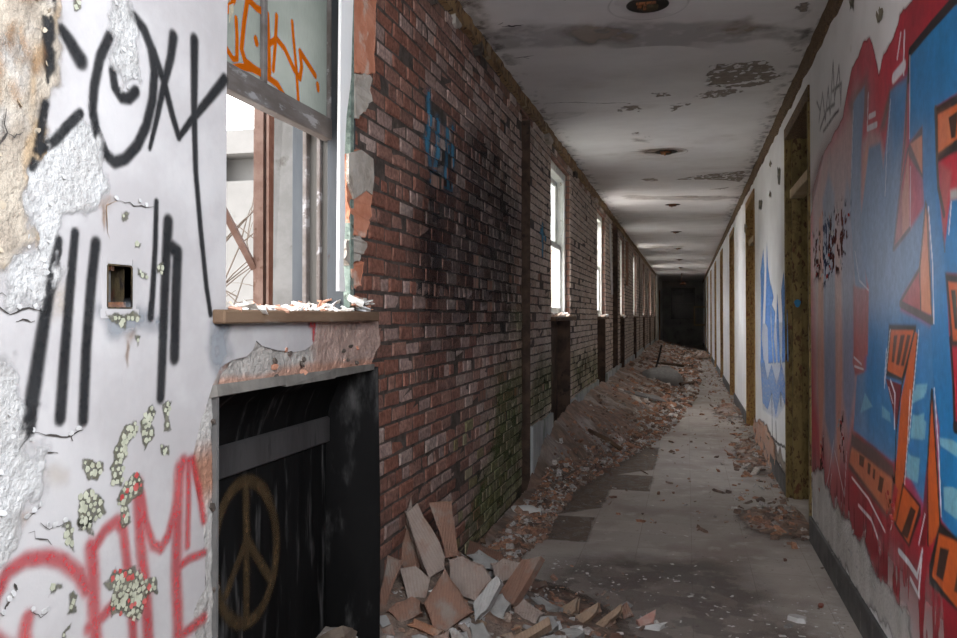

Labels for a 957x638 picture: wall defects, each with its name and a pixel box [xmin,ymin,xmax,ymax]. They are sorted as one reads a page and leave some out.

crack [0,108,23,144]
flaking render [0,0,110,312]
peeling [109,0,142,89]
flaking render [217,0,380,384]
peeling [701,61,780,99]
peeling [0,362,47,567]
peeling [62,401,171,550]
peeling [103,566,158,621]